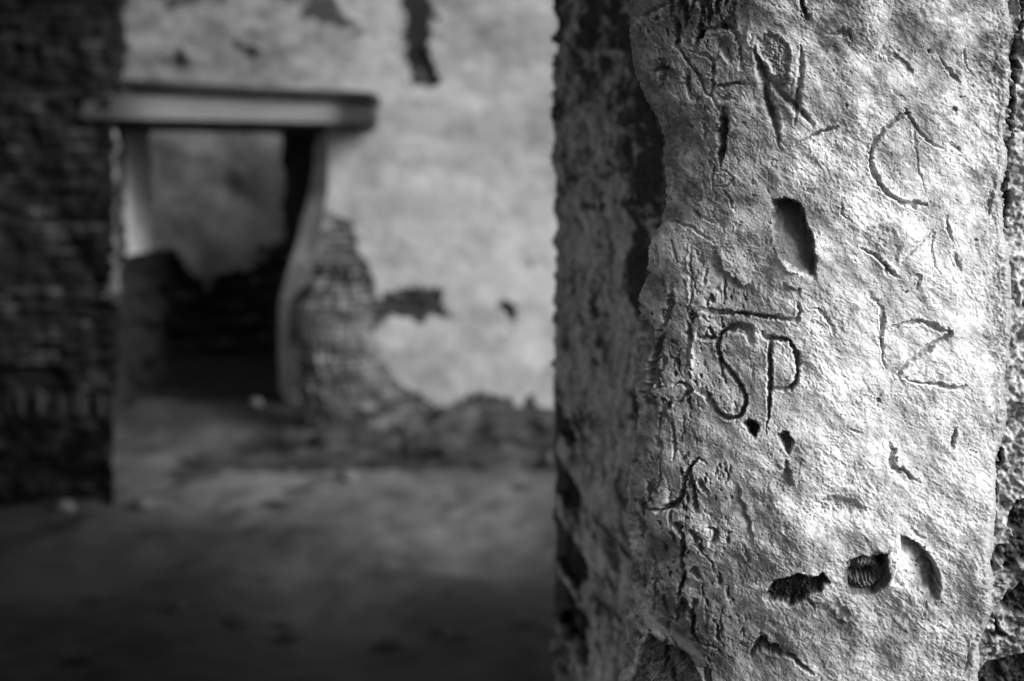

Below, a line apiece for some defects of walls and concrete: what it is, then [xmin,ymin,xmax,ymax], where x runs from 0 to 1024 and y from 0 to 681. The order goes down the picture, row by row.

flaking render [144,207,452,405]
flaking render [403,387,536,410]